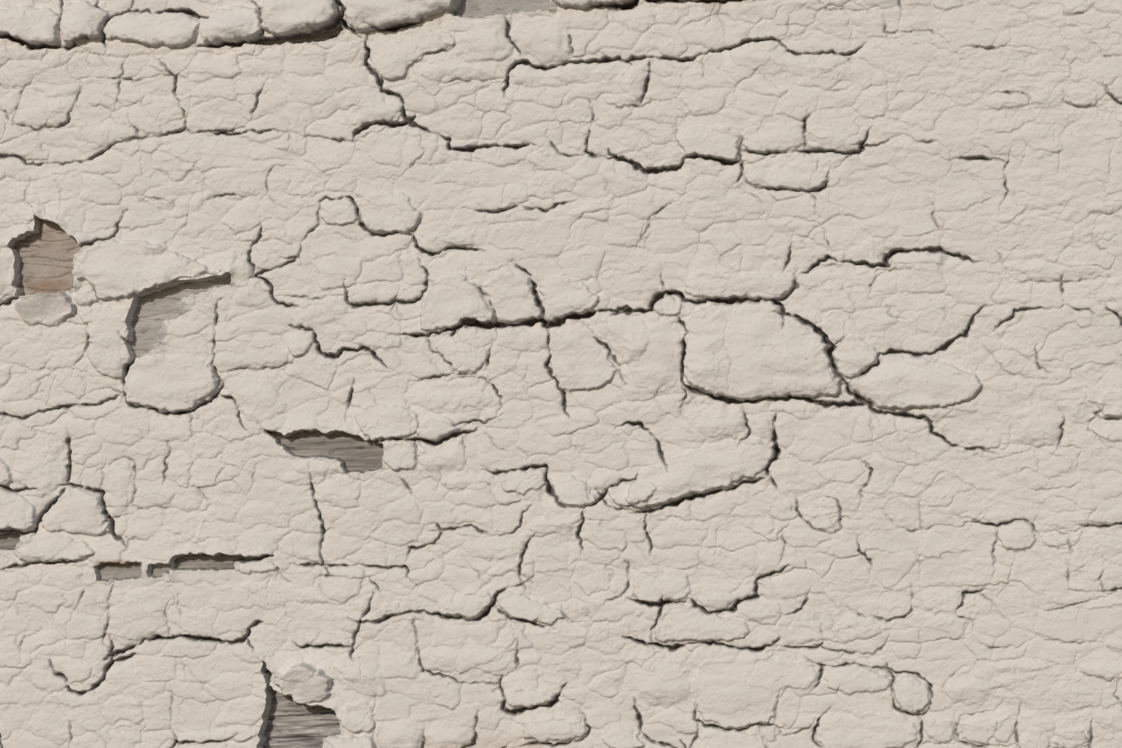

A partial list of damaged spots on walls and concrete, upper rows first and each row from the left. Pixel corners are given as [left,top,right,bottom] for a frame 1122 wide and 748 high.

crack [0,0,538,179]
peeling [446,0,554,22]
crack [437,9,868,113]
peeling [6,210,84,301]
crack [0,285,302,452]
peeling [123,270,234,362]
crack [247,99,1084,624]
peeling [261,427,387,479]
crack [0,559,264,748]
peeling [92,549,277,584]
peeling [255,659,343,748]
crack [262,463,592,748]